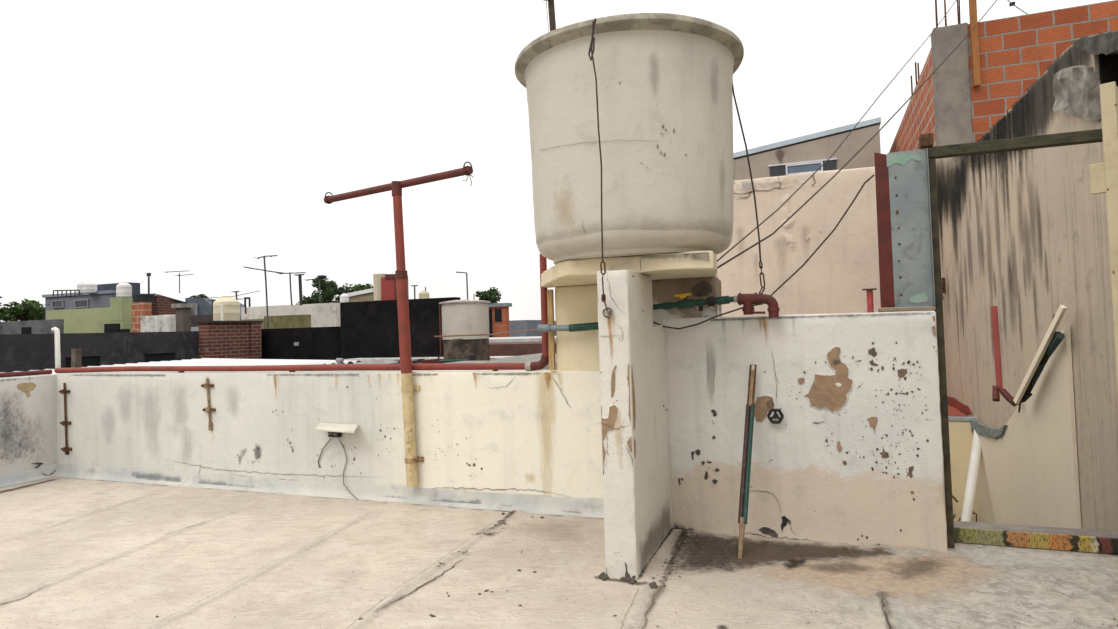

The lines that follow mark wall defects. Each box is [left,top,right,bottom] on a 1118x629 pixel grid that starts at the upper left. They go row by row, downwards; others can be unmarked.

water stain [936,45,1088,249]
peeling [600,364,636,475]
peeling [754,394,781,424]
peeling [796,342,929,501]
crack [641,587,660,629]
crack [881,594,892,629]